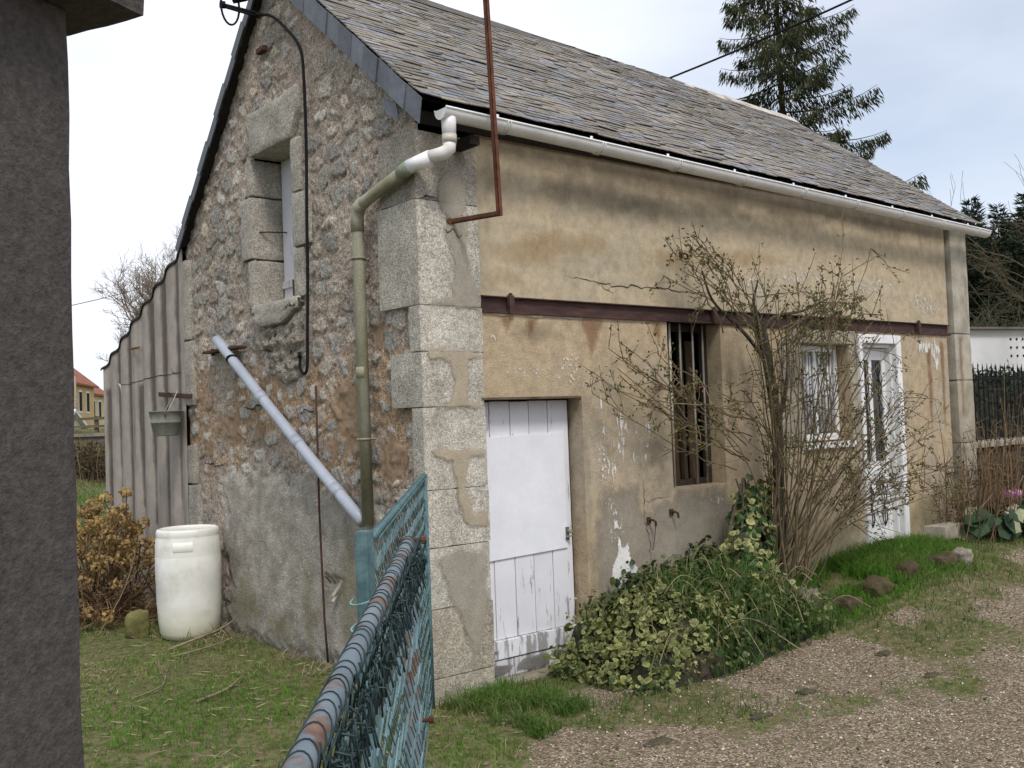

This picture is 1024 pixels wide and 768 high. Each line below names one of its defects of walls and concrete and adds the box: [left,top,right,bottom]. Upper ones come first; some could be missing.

crack [575,277,837,297]
crack [117,370,182,386]
peeling [599,389,650,482]
peeling [612,519,638,588]